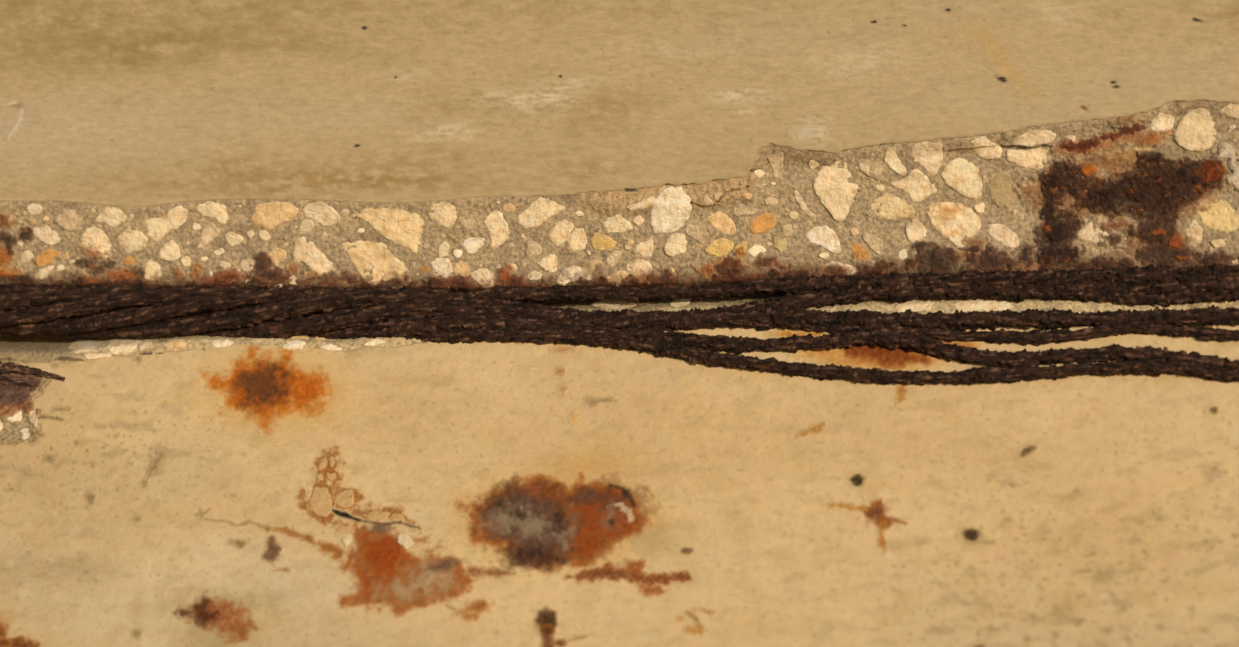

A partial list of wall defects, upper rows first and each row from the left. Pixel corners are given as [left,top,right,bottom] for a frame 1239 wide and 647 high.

spalling [1116,100,1239,167]
spalling [0,119,1121,312]
rust [0,114,1239,301]
spalling [1074,215,1133,257]
spalling [1179,188,1239,264]
spalling [807,297,1239,314]
spalling [0,334,425,446]
rust [177,334,368,449]
rust [764,328,985,407]
rust [152,435,699,647]
rust [819,496,909,553]
rust [0,606,60,647]